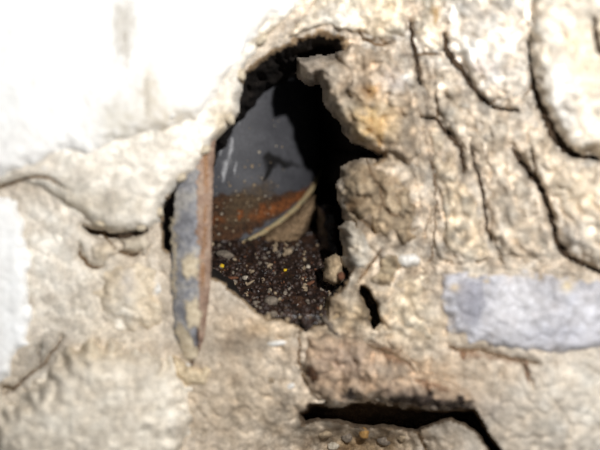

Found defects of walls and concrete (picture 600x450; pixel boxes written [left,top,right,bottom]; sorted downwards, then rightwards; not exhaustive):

rust [188,139,312,351]
flaking render [0,0,600,340]
crack [409,18,600,274]
crack [412,426,427,450]